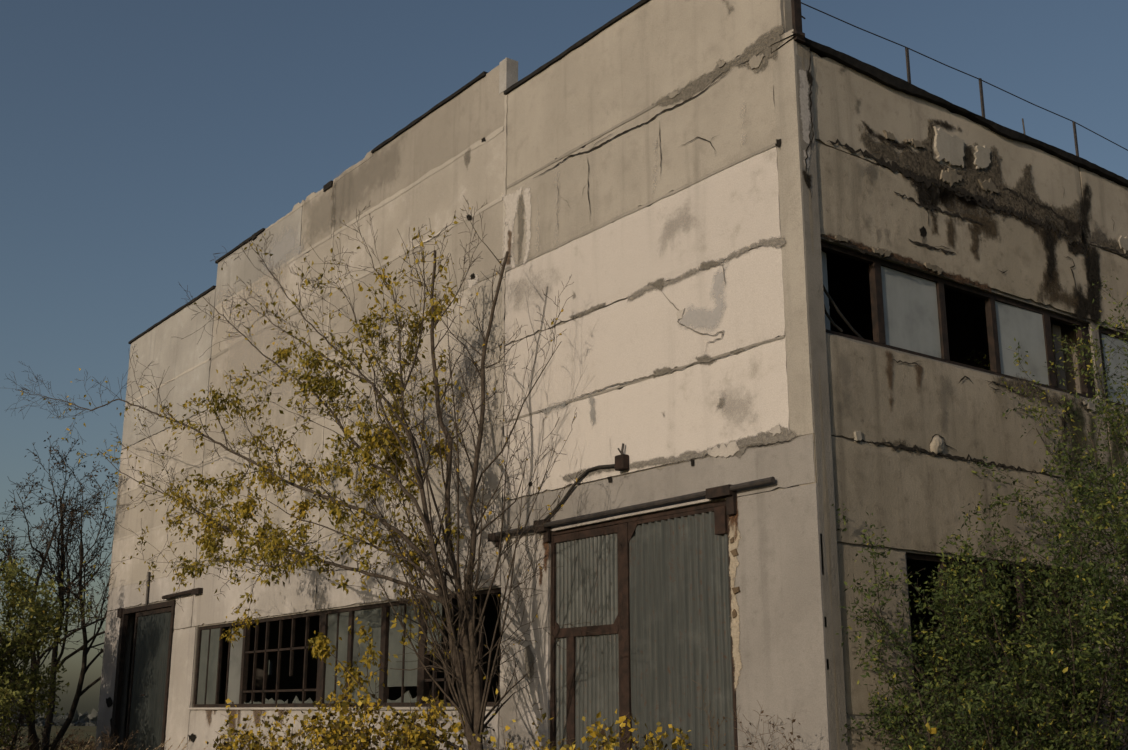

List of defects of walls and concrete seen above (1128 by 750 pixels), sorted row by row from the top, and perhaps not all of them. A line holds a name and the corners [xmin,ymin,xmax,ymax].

crack [534,50,763,229]
spalling [652,25,784,106]
peeling [799,50,814,145]
peeling [502,187,531,268]
damp [928,187,997,260]
damp [1036,184,1104,323]
spalling [570,303,605,319]
peeling [648,261,725,365]
peeling [563,425,797,483]
spalling [728,520,742,689]